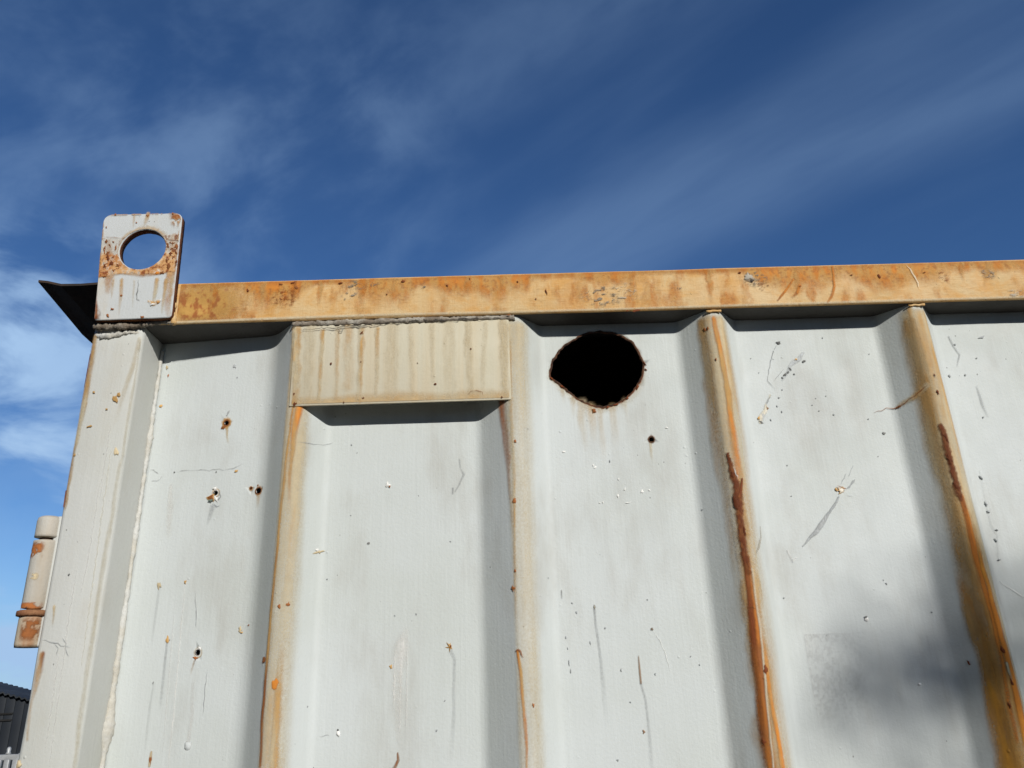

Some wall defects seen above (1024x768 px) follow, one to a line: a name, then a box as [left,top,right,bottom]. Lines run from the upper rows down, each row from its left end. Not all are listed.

corrosion [99,212,1024,320]
corrosion [20,603,39,639]
corrosion [259,314,525,768]
corrosion [516,649,535,745]
corrosion [698,294,788,768]
corrosion [903,308,1024,768]